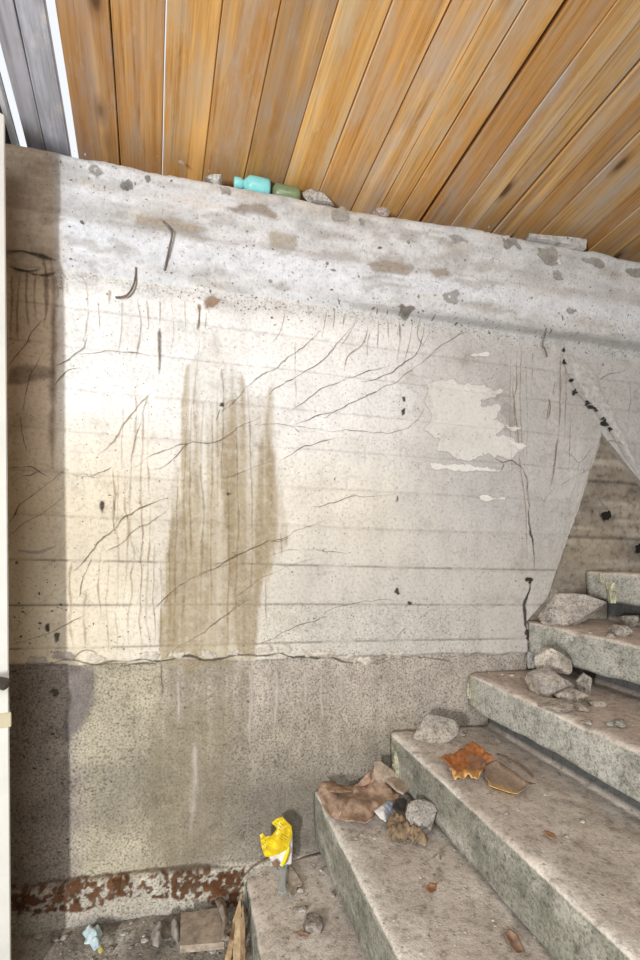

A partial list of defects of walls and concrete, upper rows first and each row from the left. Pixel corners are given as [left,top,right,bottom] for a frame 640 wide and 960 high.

crack [10,324,52,553]
crack [56,343,142,383]
crack [113,334,459,470]
peeling [424,379,527,472]
crack [80,502,155,594]
leakage [165,418,246,848]
crack [158,529,299,605]
crack [523,577,533,639]
corrosion [11,866,245,916]